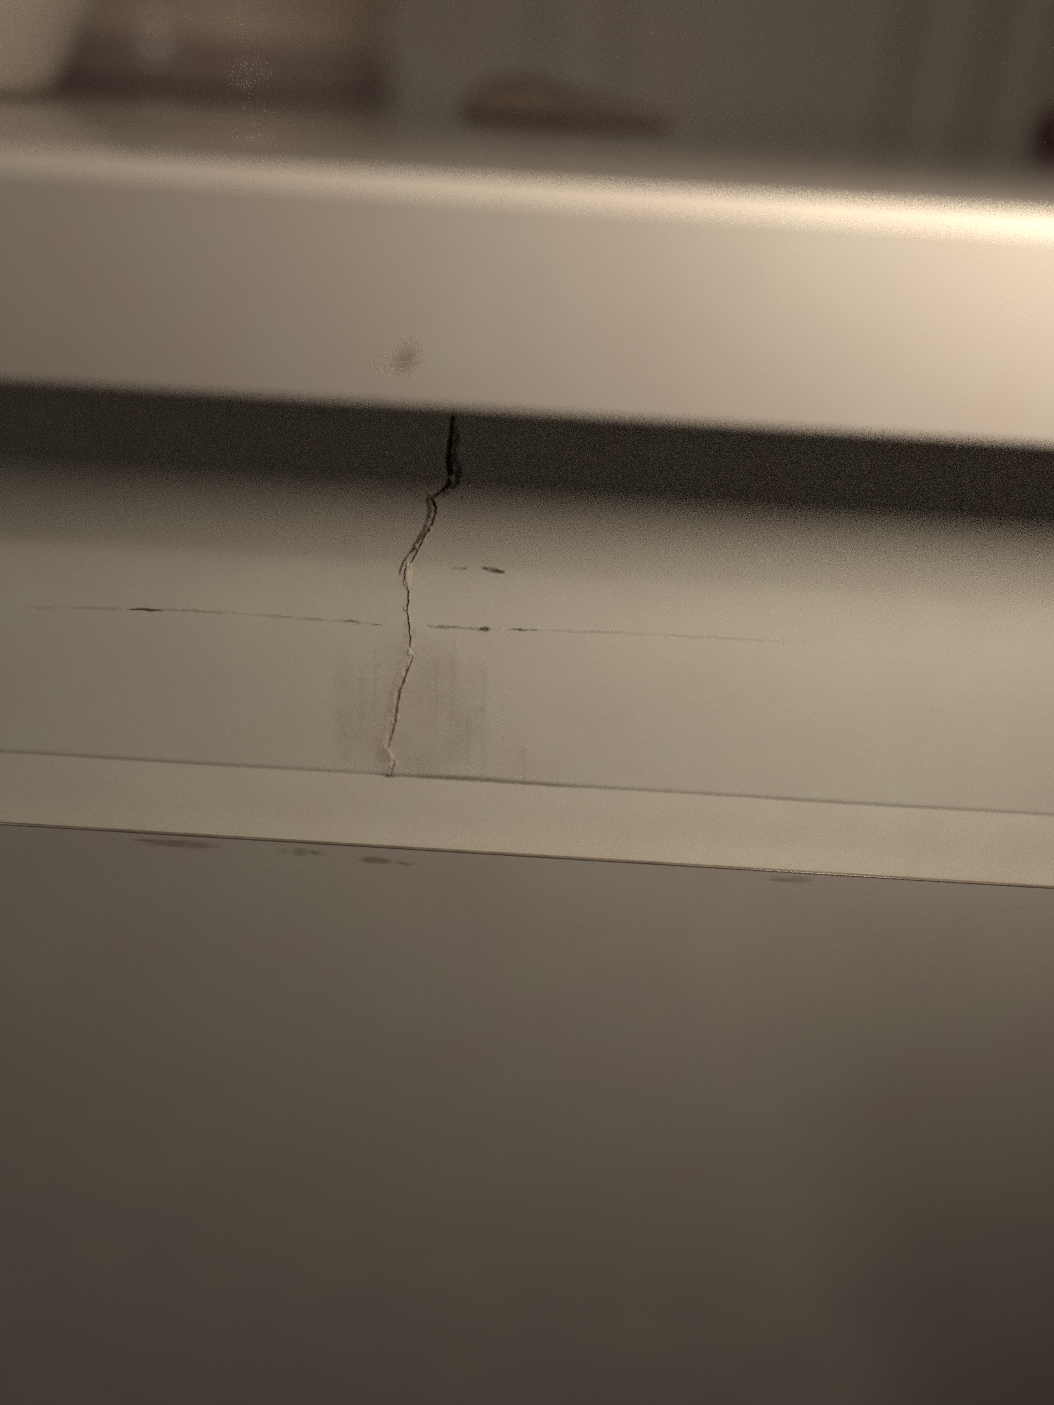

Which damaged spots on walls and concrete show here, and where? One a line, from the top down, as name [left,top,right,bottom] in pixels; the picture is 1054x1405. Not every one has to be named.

crack [378,409,461,776]